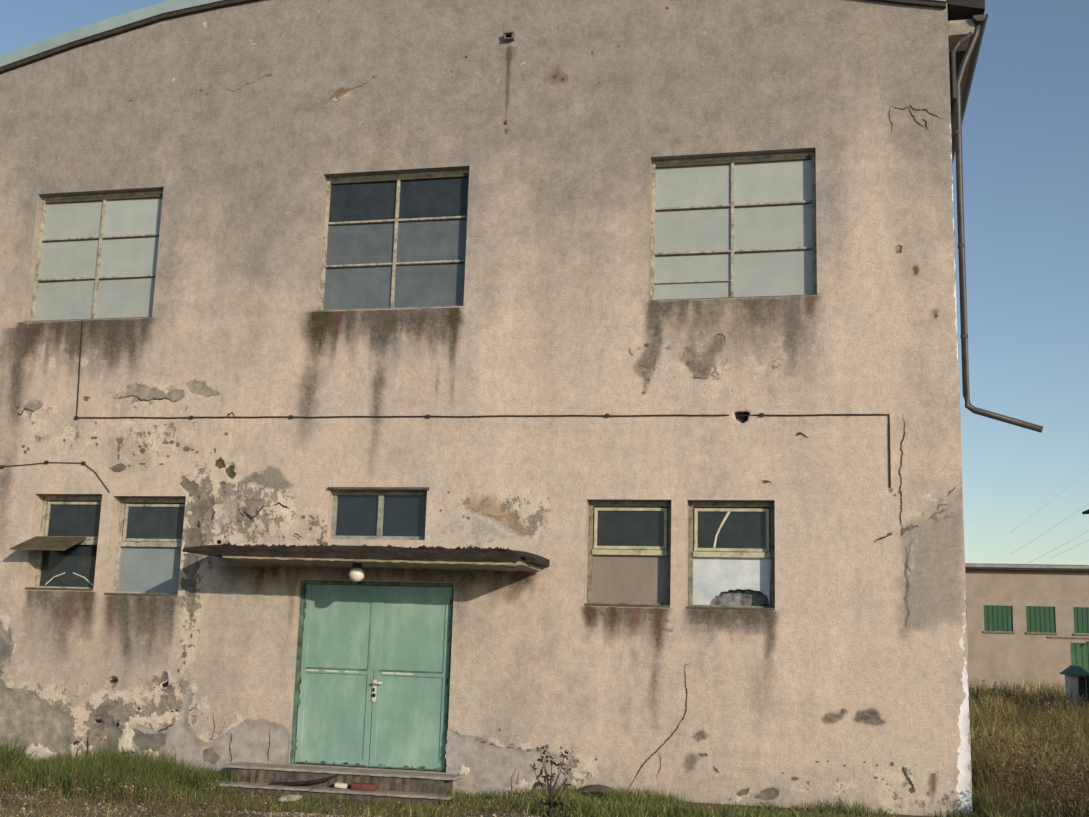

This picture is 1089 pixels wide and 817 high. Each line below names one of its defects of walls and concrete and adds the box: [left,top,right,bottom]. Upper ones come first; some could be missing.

crack [889,105,944,130]
damp [13,318,152,402]
flaking render [117,379,220,402]
damp [307,307,460,352]
damp [649,300,683,321]
flaking render [180,448,290,618]
crack [874,421,956,626]
damp [107,595,175,633]
damp [584,606,664,647]
flaking render [0,625,297,776]
peeling [955,594,972,815]
flaking render [404,712,580,797]